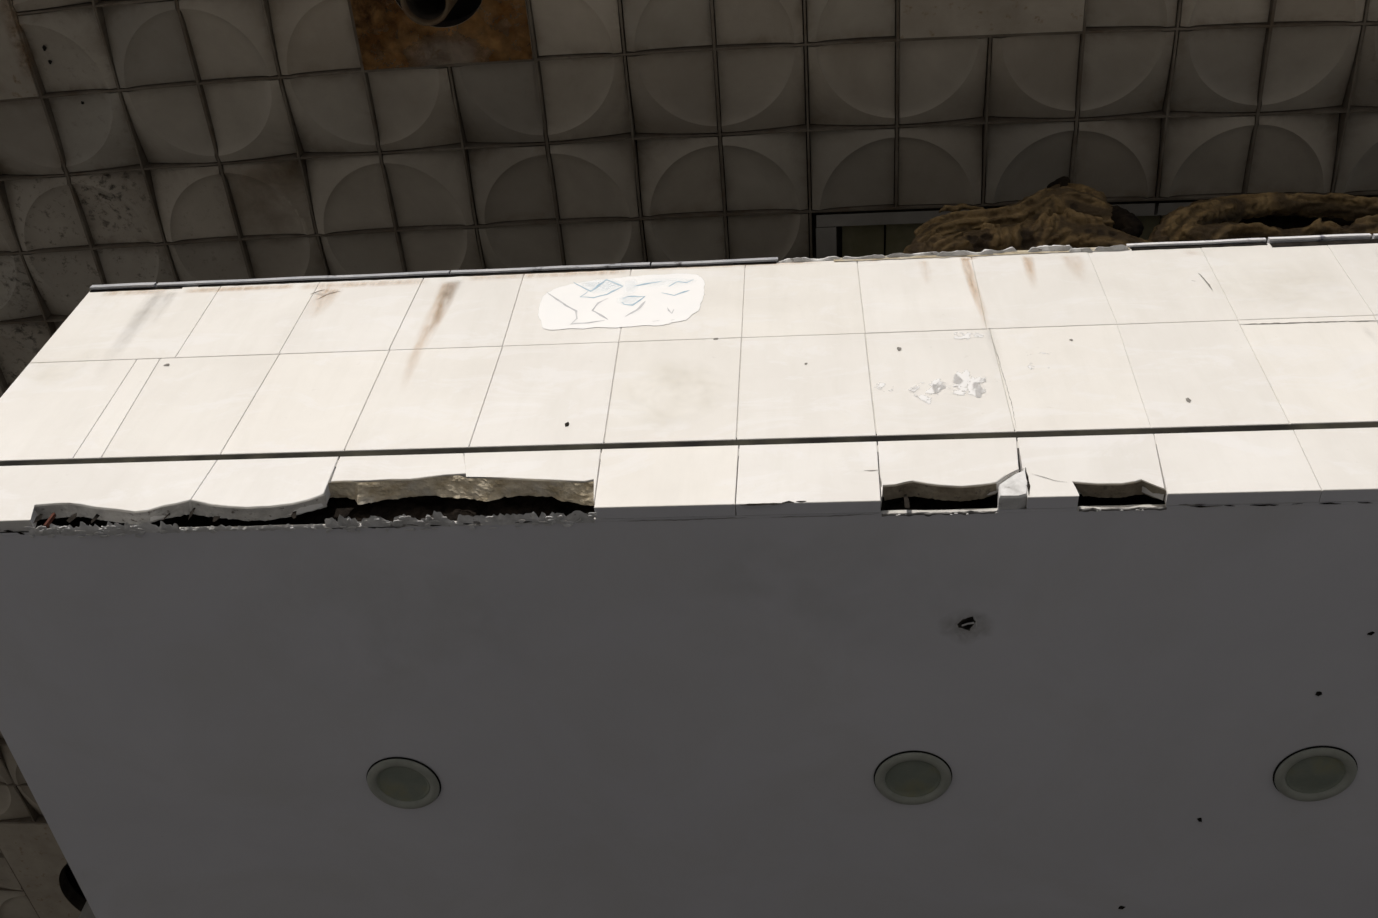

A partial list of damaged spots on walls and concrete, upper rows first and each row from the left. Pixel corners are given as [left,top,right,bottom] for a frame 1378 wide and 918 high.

corrosion [350,0,533,70]
spalling [25,475,597,538]
spalling [880,483,998,517]
spalling [1073,481,1167,512]